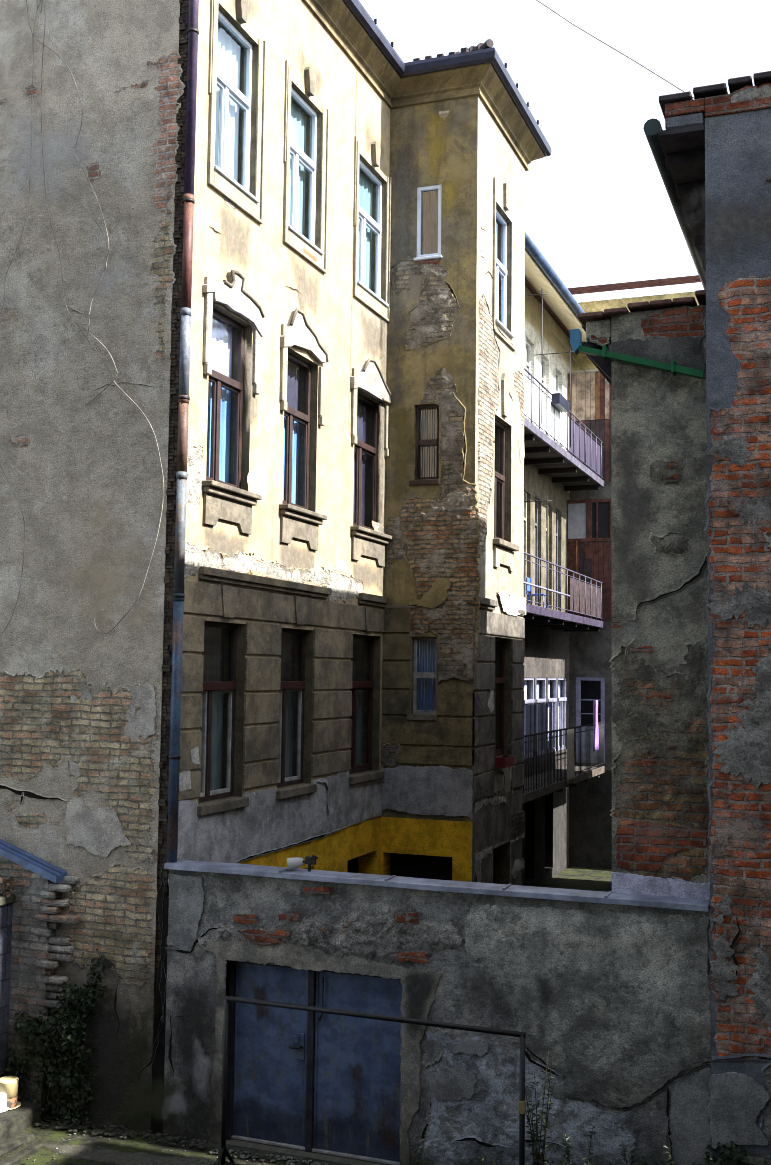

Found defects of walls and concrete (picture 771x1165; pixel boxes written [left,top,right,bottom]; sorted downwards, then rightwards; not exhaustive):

peeling [186,443,205,525]
peeling [247,464,269,509]
flaking render [372,293,500,684]
peeling [184,538,364,604]
peeling [496,589,526,616]
crack [625,552,708,679]
crack [0,784,68,805]
flaking render [0,667,465,989]
crack [132,867,223,1085]
crack [419,1060,566,1161]
peeling [416,1027,638,1165]
crack [525,1045,771,1164]